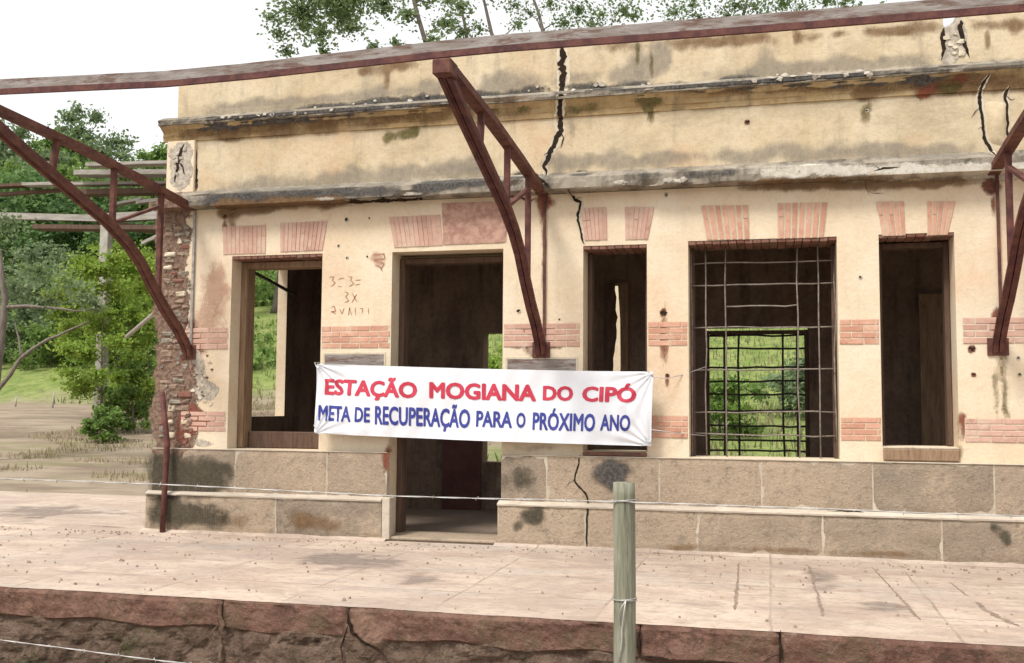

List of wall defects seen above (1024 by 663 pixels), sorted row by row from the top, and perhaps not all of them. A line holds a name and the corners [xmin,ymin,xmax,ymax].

leakage [182,63,451,143]
leakage [477,74,545,113]
leakage [581,34,1024,120]
spalling [942,17,967,64]
crack [940,20,1013,156]
crack [510,48,585,244]
spalling [148,141,227,459]
leakage [143,453,240,530]
leakage [515,506,543,529]
crack [565,458,589,546]
leakage [593,459,632,491]
crack [340,613,387,663]